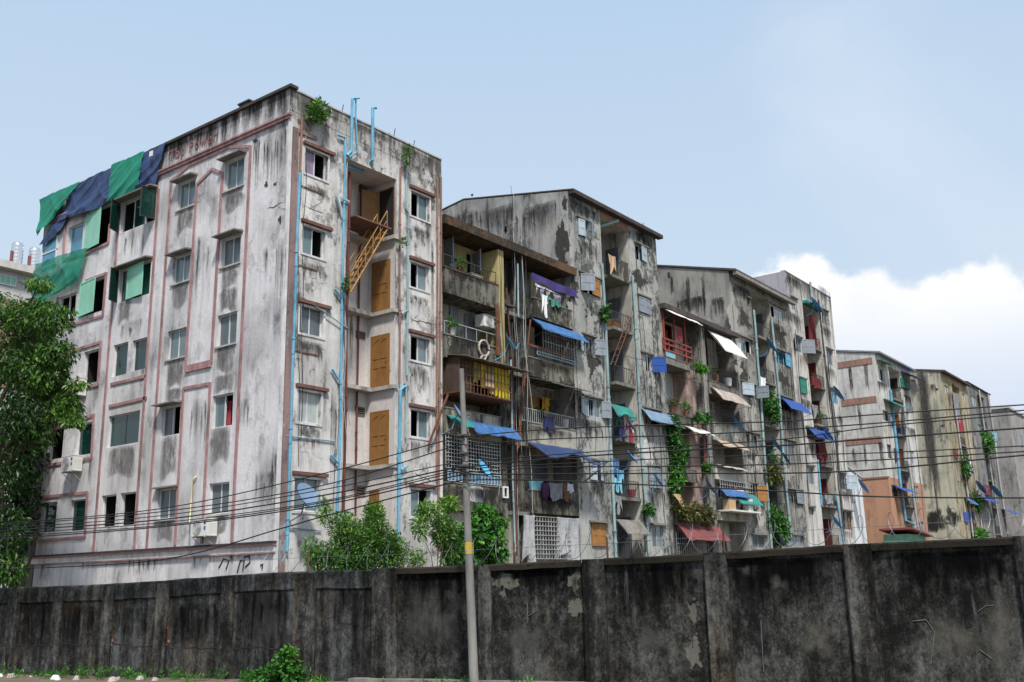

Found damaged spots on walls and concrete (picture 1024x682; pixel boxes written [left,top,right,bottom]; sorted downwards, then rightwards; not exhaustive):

damp [169,94,285,156]
damp [226,188,242,212]
damp [457,203,556,233]
damp [175,240,209,307]
damp [668,273,723,311]
damp [739,308,752,330]
damp [161,436,176,479]
damp [211,429,228,458]
damp [906,374,960,532]
peeling [491,572,524,598]
peeling [559,567,584,623]
peeling [682,596,709,676]